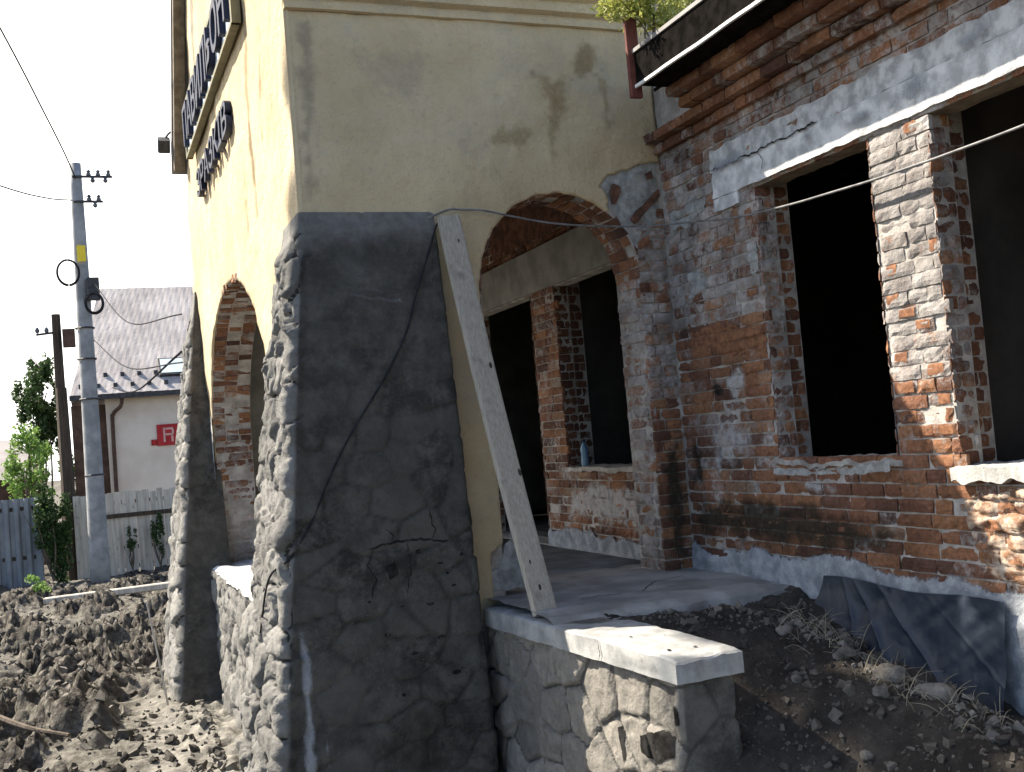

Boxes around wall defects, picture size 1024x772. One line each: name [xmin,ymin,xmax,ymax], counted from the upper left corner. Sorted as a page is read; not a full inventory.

crack [709,122,815,172]
peeling [601,162,711,252]
peeling [747,241,761,296]
water stain [728,369,743,397]
crack [367,508,448,599]
water stain [665,445,686,554]
water stain [700,501,889,551]